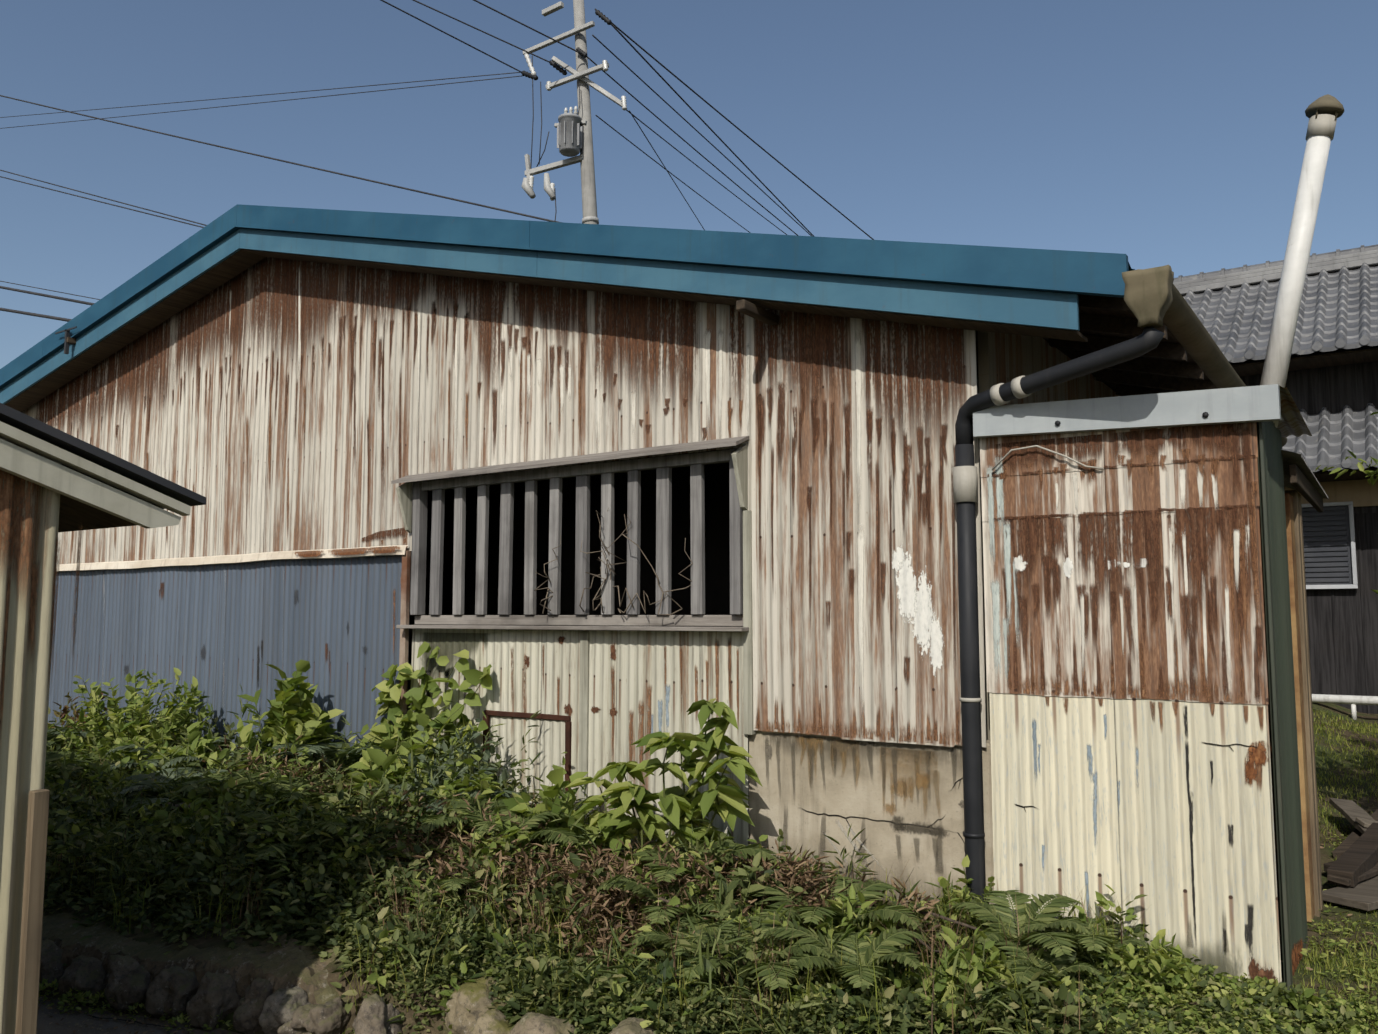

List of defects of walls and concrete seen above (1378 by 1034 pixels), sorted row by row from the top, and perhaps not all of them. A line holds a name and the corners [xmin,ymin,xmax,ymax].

rust [36,257,699,532]
rust [0,470,82,728]
rust [295,527,406,557]
rust [511,636,572,716]
rust [591,639,739,783]
rust [728,305,965,663]
rust [756,702,962,745]
rust [987,423,1268,787]
leakage [892,817,945,836]